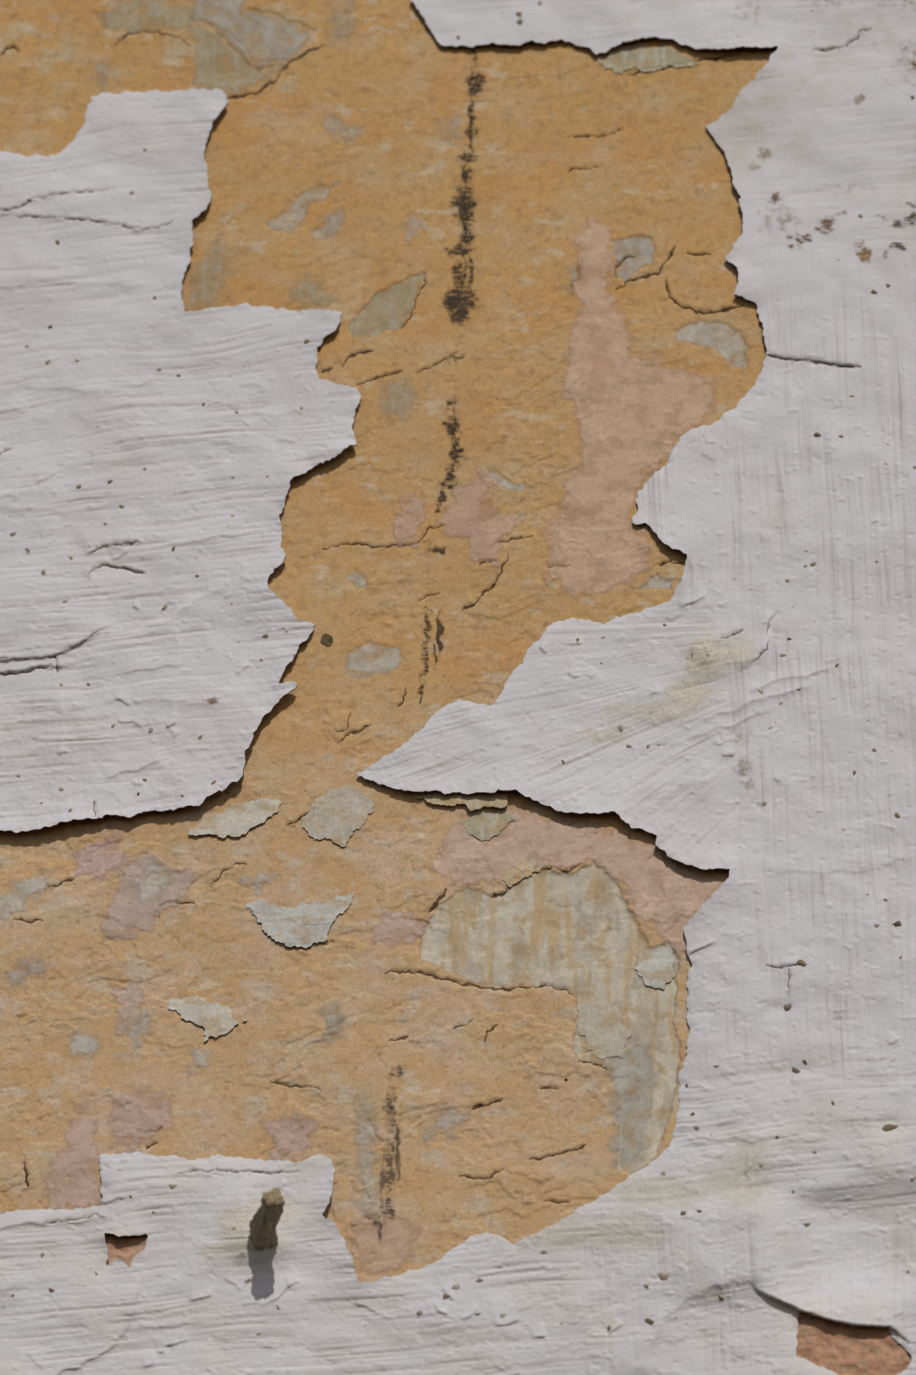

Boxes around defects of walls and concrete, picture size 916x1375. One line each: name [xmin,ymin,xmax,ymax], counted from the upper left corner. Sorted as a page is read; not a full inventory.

crack [419,535,533,609]
crack [0,630,99,676]
peeling [0,0,778,1283]
peeling [796,1313,916,1375]